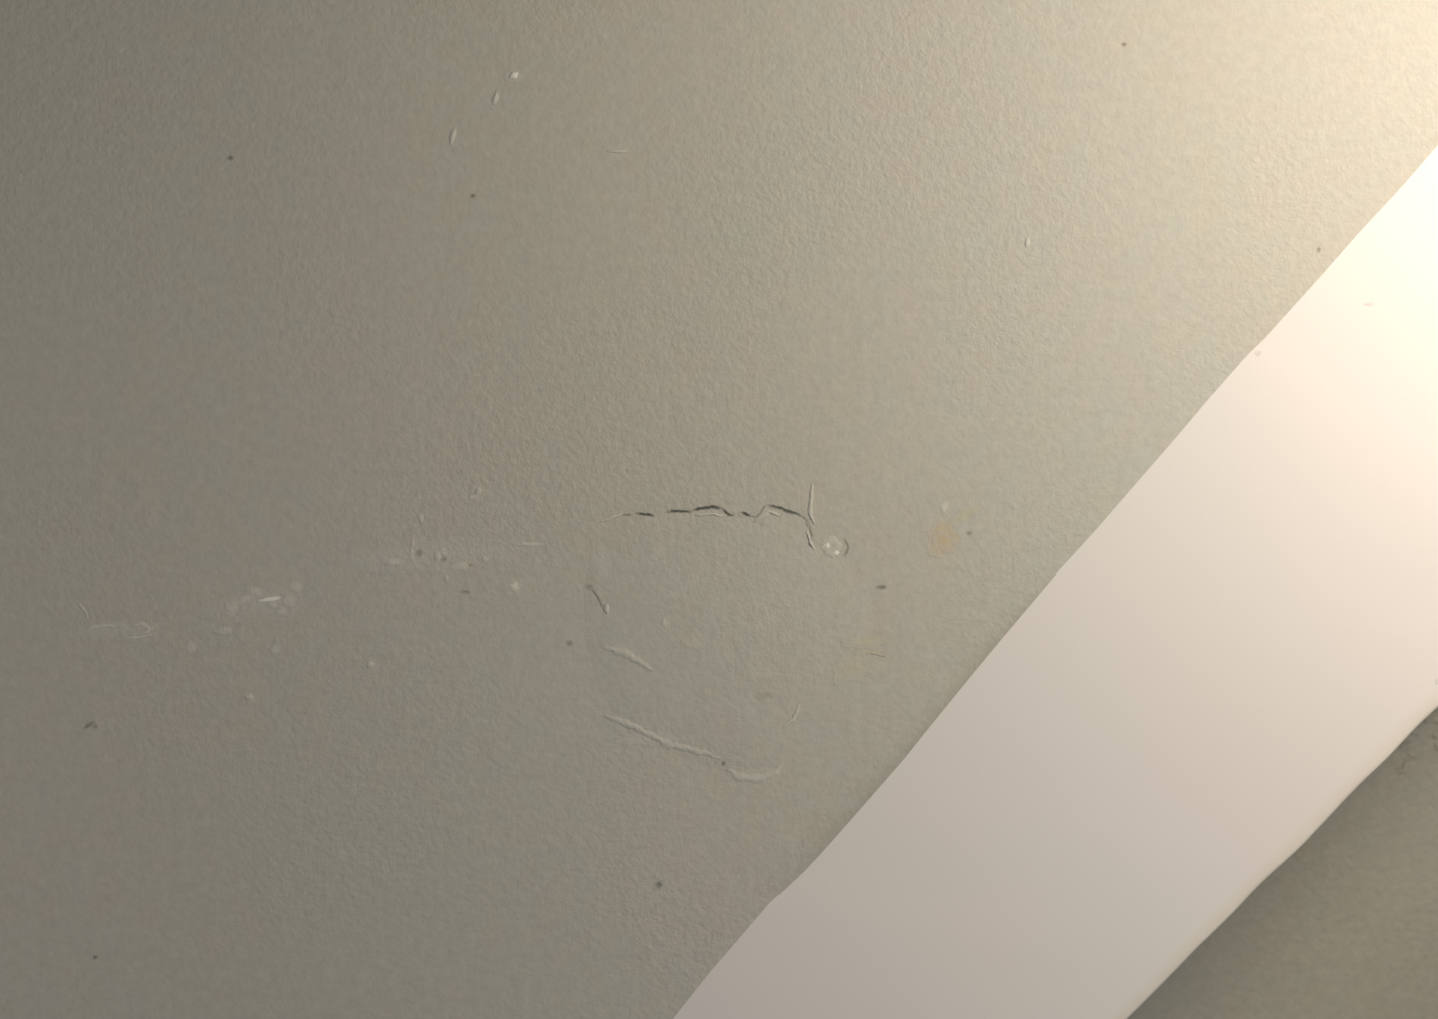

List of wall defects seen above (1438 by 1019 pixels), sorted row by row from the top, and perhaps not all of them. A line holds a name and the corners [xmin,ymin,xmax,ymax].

crack [600,483,815,550]